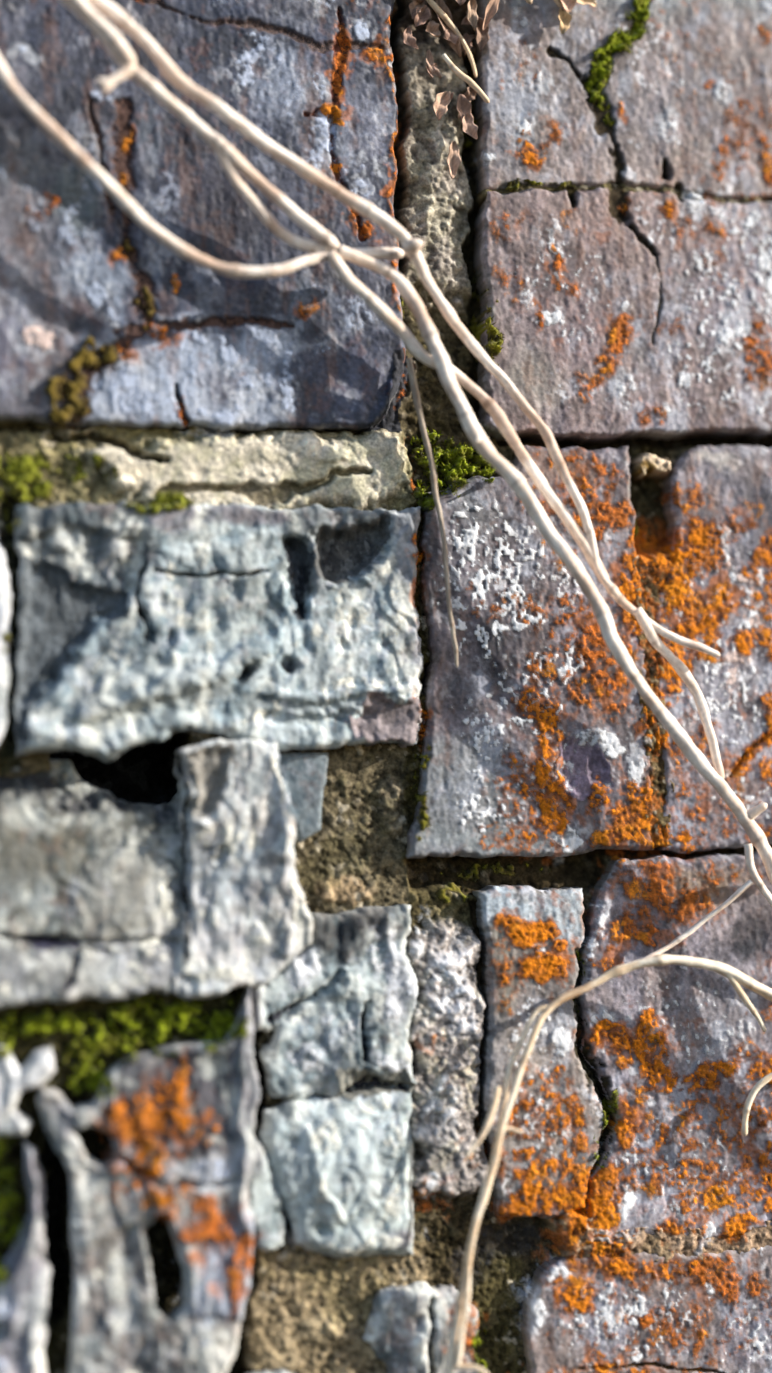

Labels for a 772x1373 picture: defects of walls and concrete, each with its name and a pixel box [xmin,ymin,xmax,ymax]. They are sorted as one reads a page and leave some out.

crack [50,98,295,431]
crack [134,0,391,242]
crack [546,27,663,344]
crack [661,159,683,202]
spalling [0,545,136,749]
spalling [279,510,391,620]
spalling [344,691,425,748]
peeling [0,738,329,1373]
crack [572,948,612,1144]